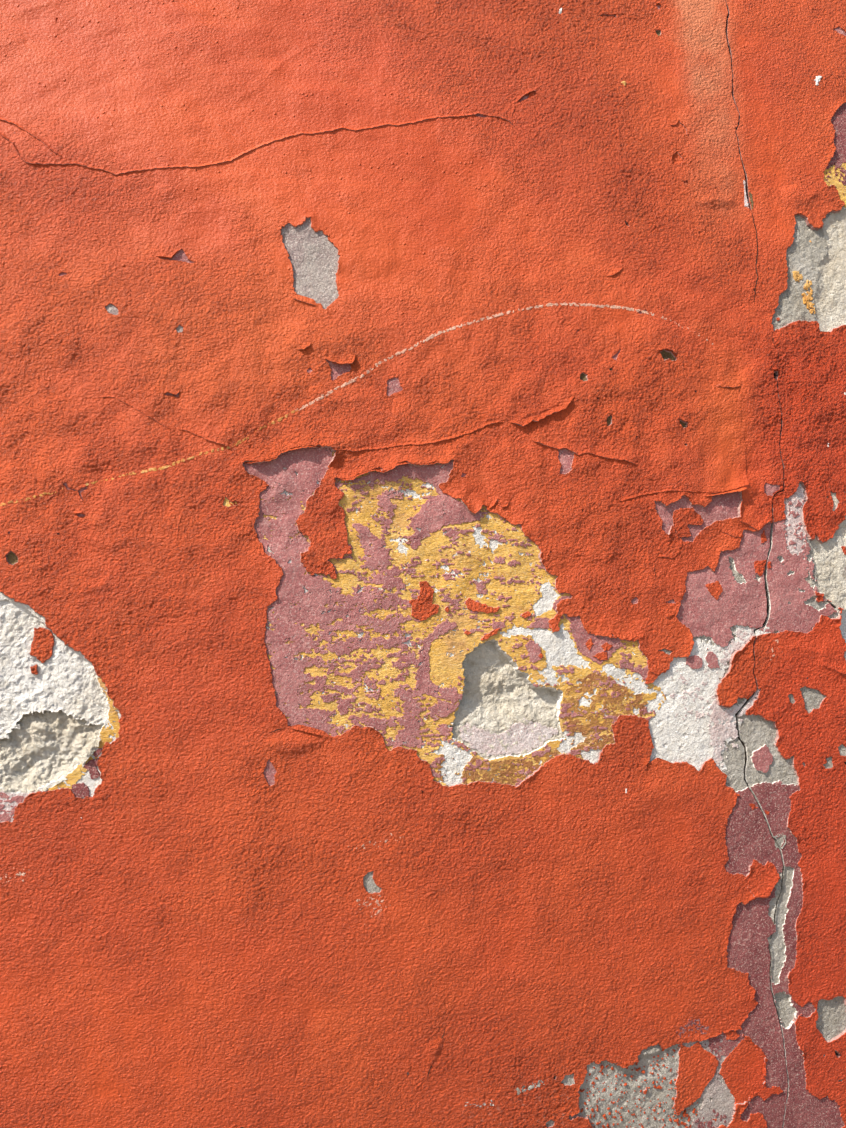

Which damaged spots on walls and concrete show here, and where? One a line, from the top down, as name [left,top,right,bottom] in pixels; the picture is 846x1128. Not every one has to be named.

peeling [281,219,340,309]
crack [743,178,758,303]
peeling [772,103,846,332]
crack [754,570,769,631]
spalling [0,593,121,822]
peeling [244,365,846,1128]
crack [735,695,778,846]